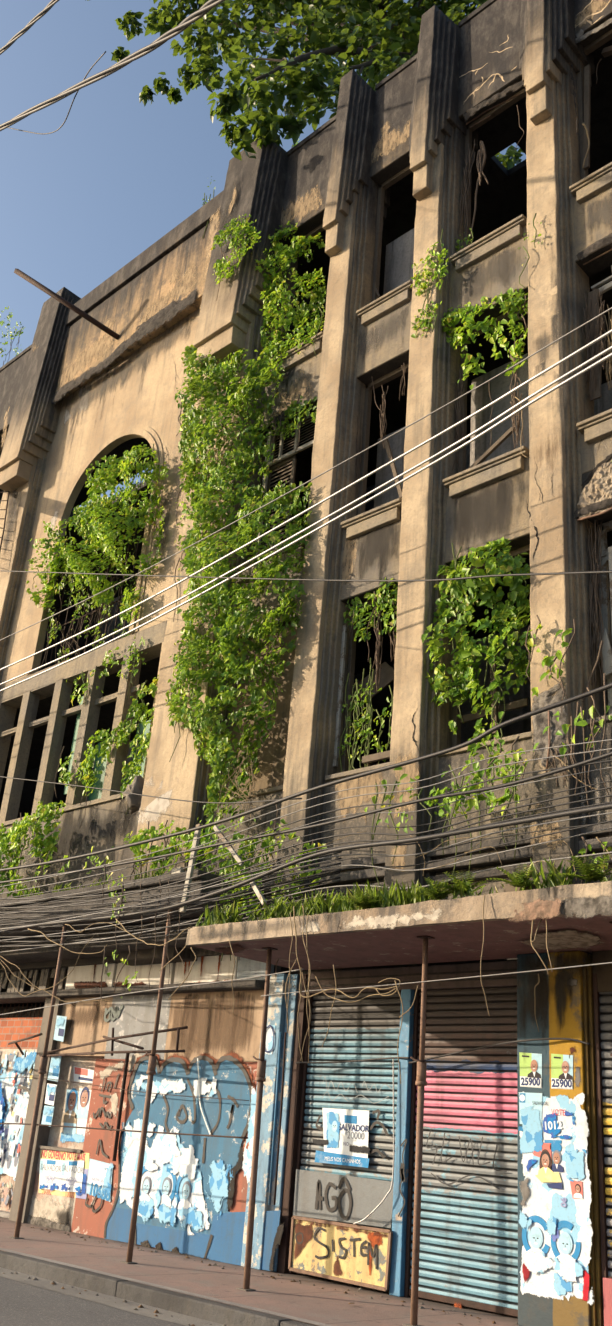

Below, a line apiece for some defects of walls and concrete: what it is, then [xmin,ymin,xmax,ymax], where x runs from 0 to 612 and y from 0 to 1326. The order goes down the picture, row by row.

crack [576,1,610,26]
crack [459,36,516,103]
peeling [371,121,410,165]
spalling [509,895,612,950]